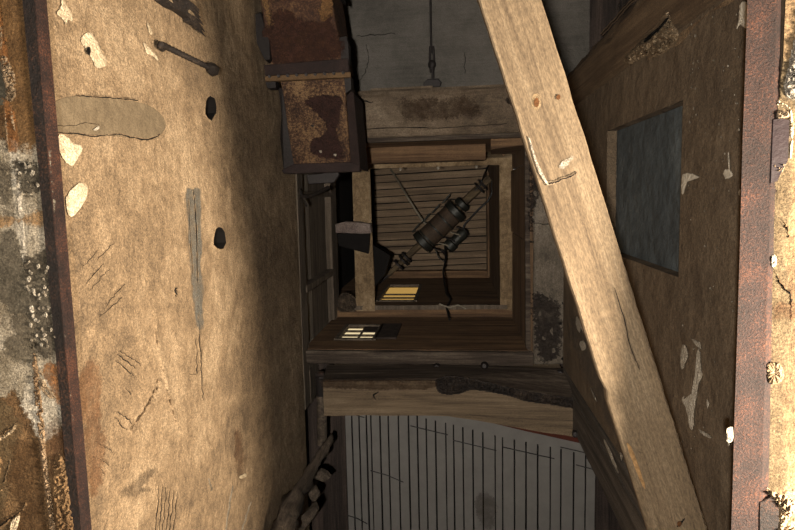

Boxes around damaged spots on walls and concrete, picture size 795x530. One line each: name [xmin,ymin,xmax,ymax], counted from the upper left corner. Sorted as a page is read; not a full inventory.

leakage [0,27,62,504]
peeling [81,32,107,68]
rust [305,94,344,160]
flaking render [759,40,795,530]